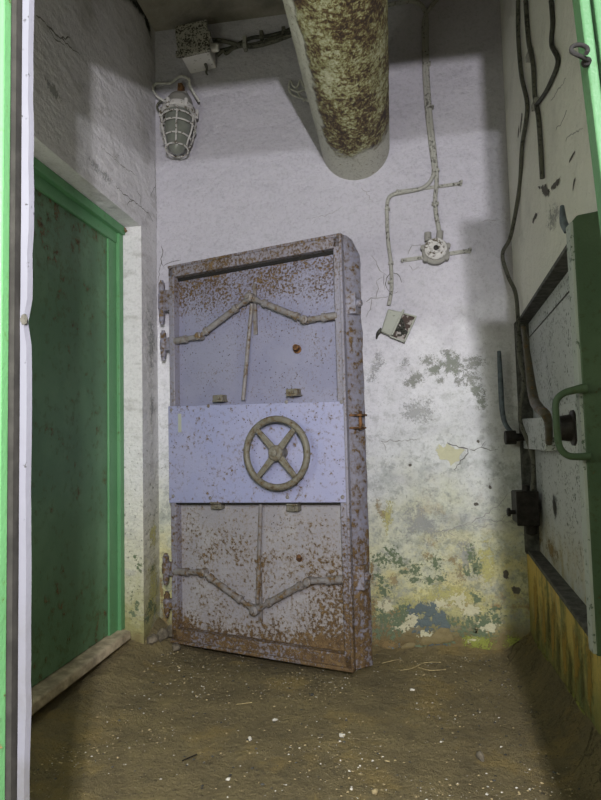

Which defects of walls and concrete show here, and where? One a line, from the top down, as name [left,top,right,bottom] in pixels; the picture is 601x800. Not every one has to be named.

crack [36,15,80,55]
peeling [370,542,507,649]